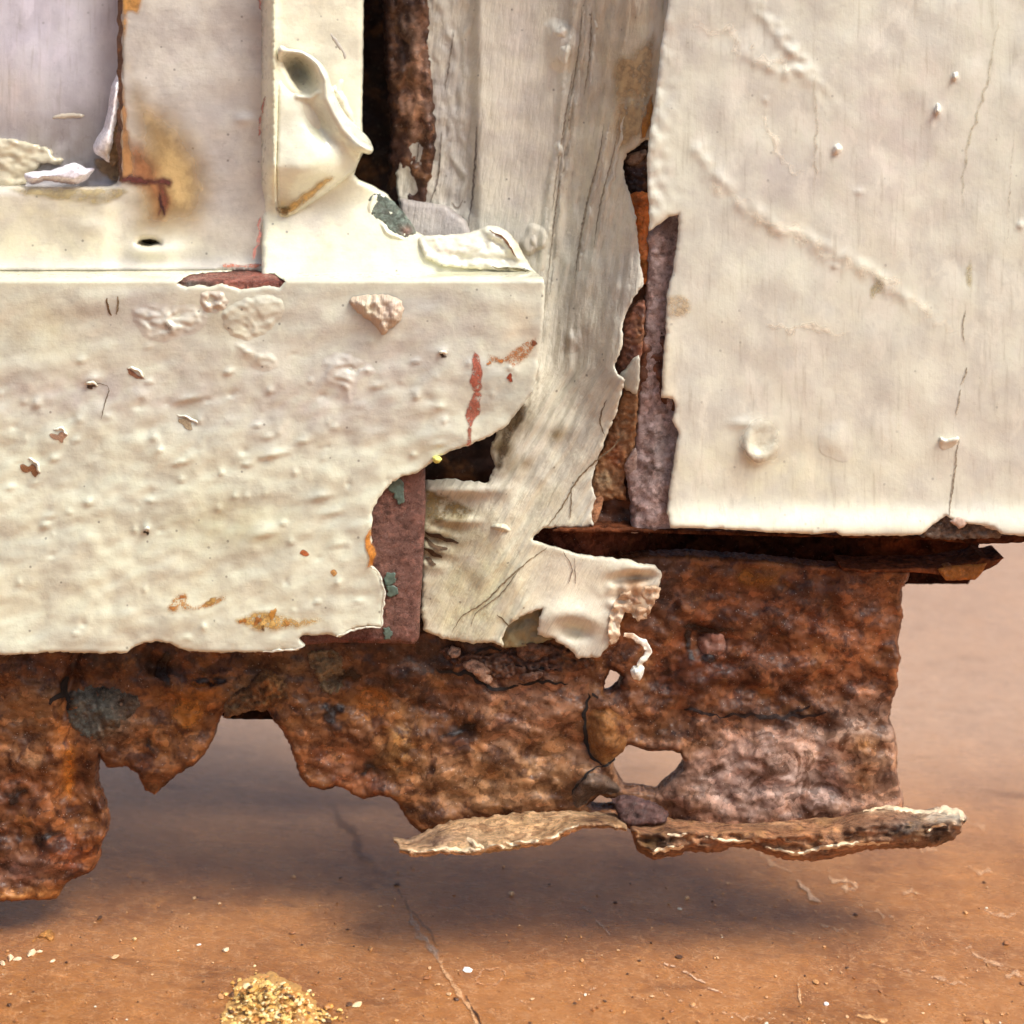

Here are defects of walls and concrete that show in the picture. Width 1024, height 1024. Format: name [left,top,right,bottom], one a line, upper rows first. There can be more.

corrosion [382,0,437,208]
peeling [0,138,63,186]
corrosion [122,93,201,221]
peeling [178,270,285,289]
corrosion [591,42,675,524]
spalling [20,457,41,477]
spalling [176,414,198,430]
corrosion [465,340,537,445]
crack [939,367,967,517]
corrosion [169,594,222,611]
corrosion [239,609,316,631]
spalling [337,566,386,637]